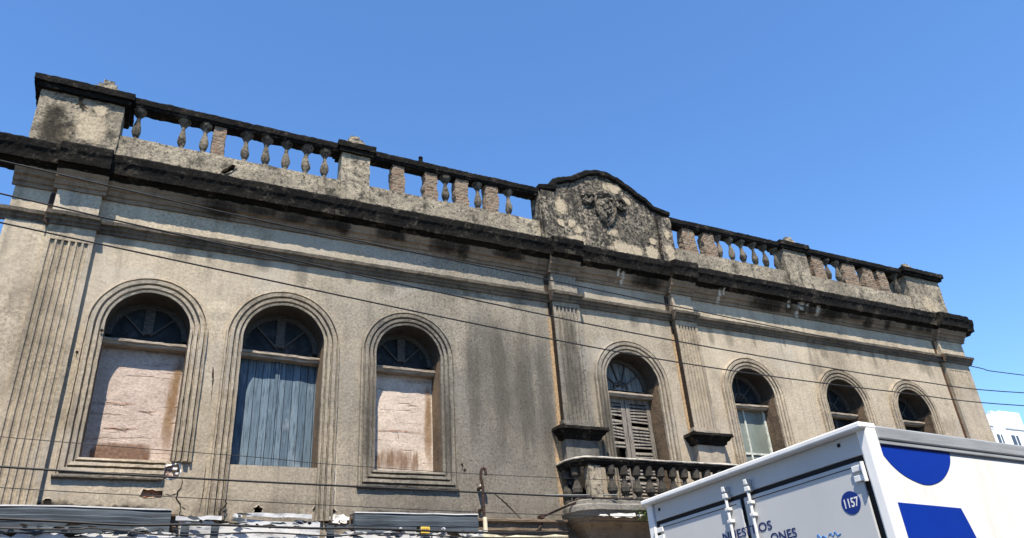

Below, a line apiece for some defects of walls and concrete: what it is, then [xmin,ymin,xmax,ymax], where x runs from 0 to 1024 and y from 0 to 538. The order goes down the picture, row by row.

water stain [38,104,74,142]
water stain [43,193,55,223]
peeling [555,197,586,245]
peeling [602,183,631,205]
peeling [608,228,675,261]
water stain [751,297,872,327]
water stain [543,276,564,421]
spalling [139,462,182,499]
crack [166,468,227,515]